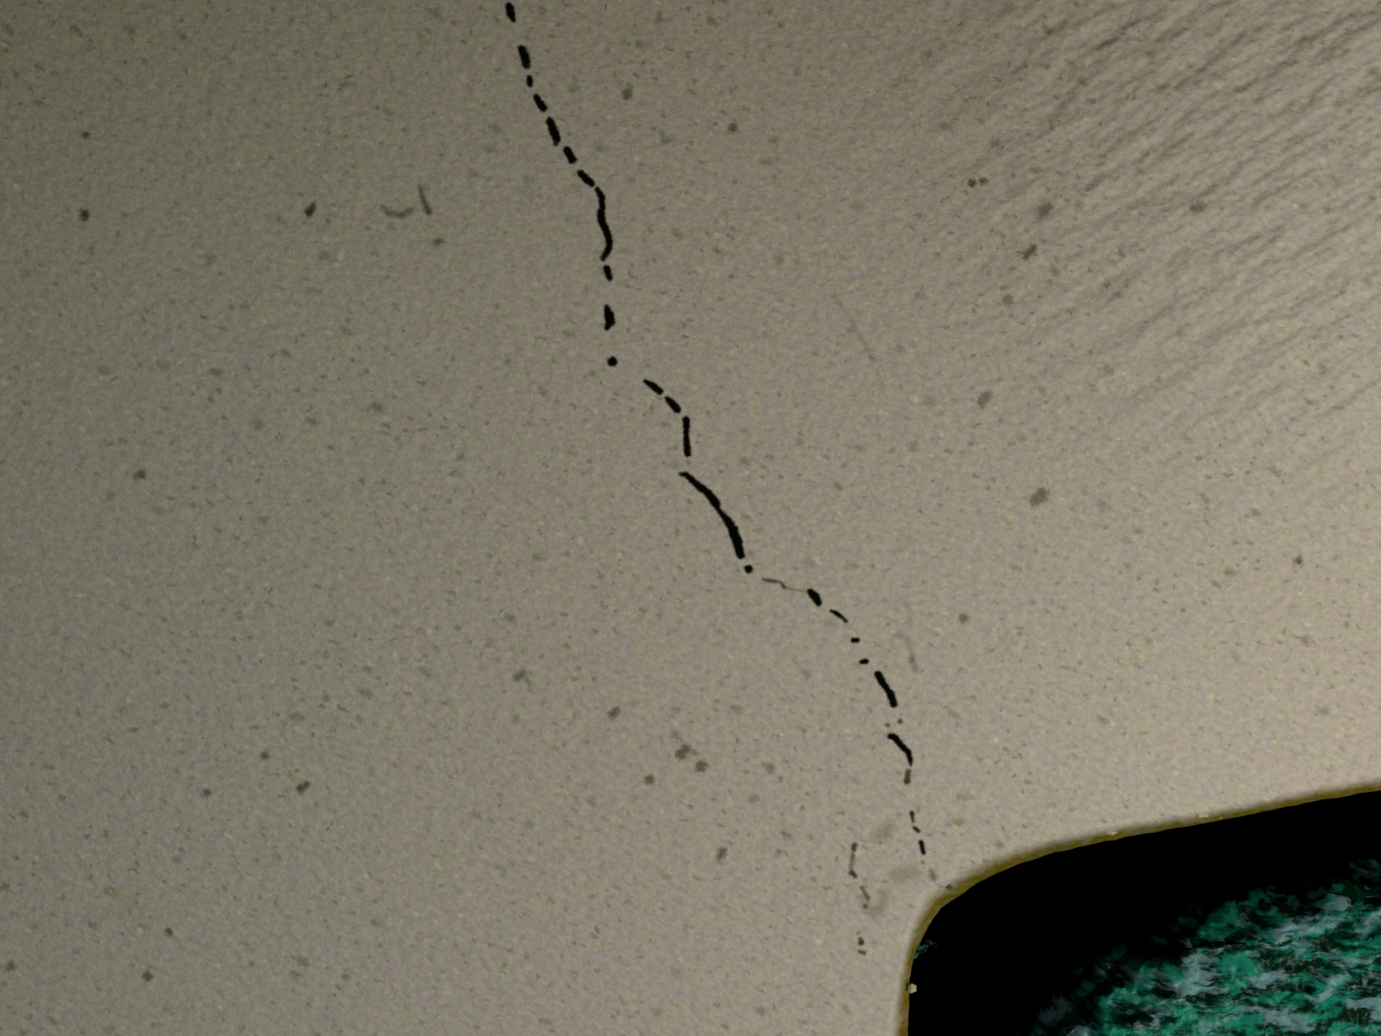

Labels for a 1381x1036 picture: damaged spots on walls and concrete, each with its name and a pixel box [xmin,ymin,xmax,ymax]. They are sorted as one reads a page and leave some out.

crack [506,3,926,855]
crack [849,844,857,878]